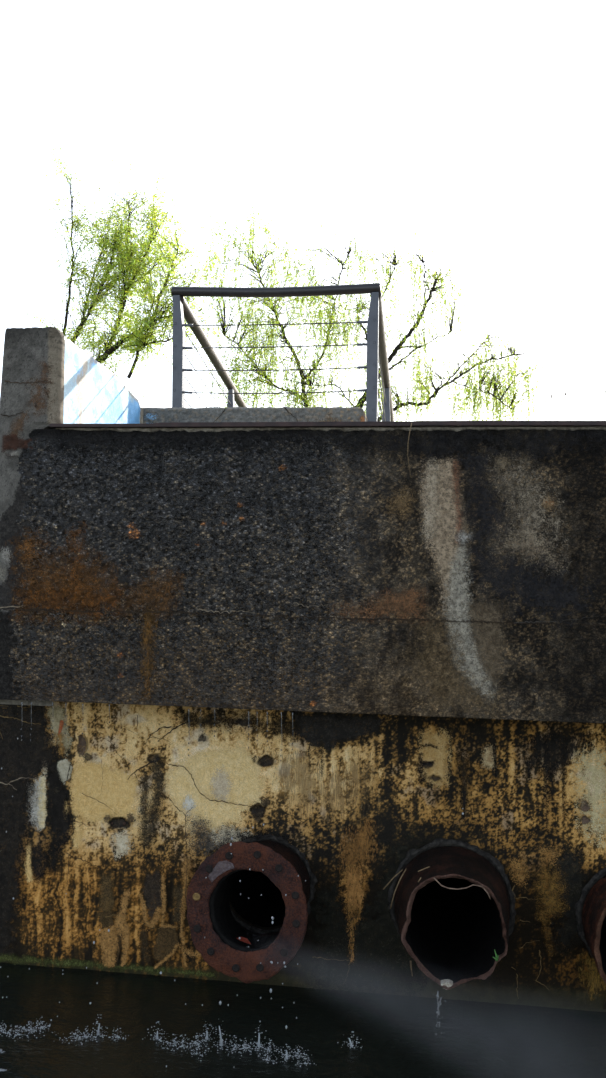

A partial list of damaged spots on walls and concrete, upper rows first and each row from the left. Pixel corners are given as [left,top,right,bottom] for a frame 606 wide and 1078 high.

damp [0,429,606,967]
crack [61,712,317,898]
damp [182,814,453,998]